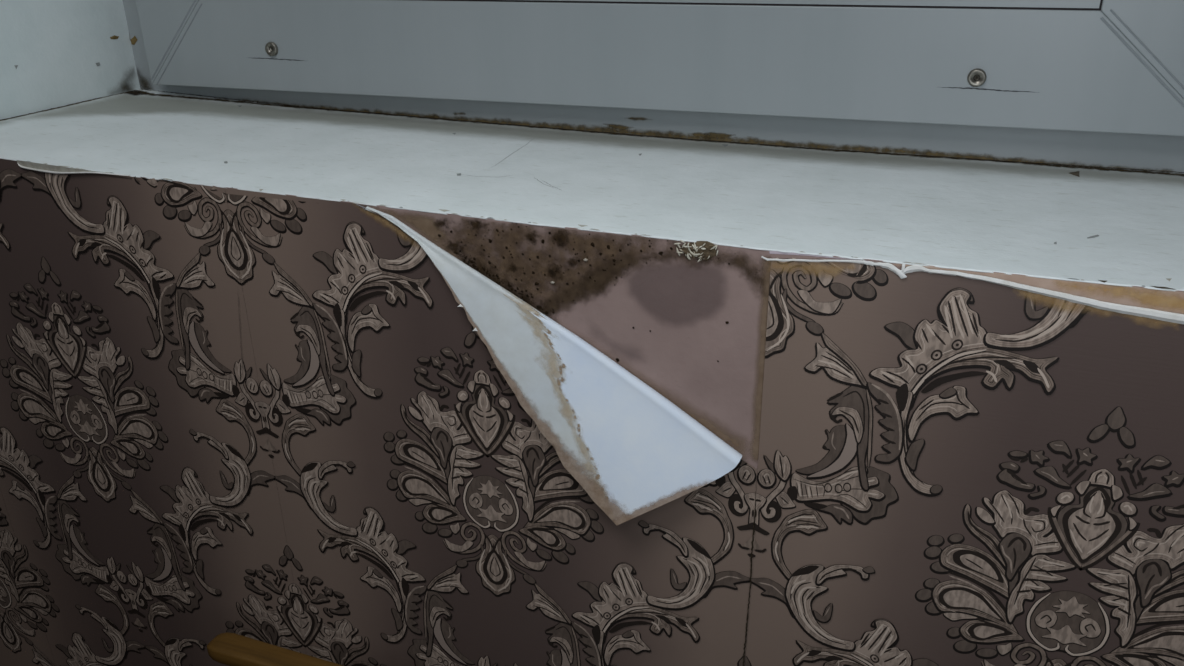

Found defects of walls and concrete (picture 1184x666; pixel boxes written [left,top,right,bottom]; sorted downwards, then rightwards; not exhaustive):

water stain [367,211,707,525]
flaking render [674,240,718,262]
water stain [644,253,771,460]
peeling [892,262,922,279]